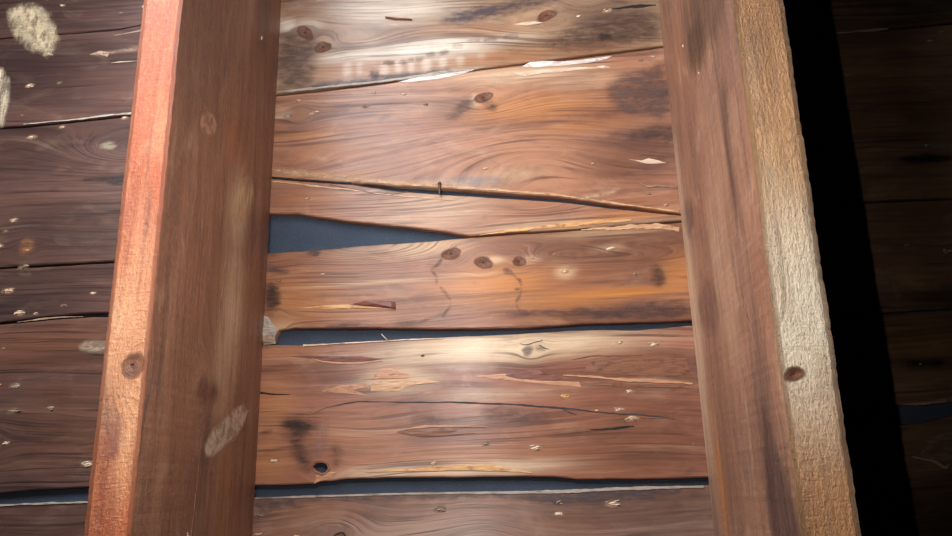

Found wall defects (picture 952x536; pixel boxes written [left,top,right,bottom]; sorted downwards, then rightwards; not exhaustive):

damp [0,70,8,124]
damp [611,68,669,114]
crack [272,169,679,213]
crack [260,392,673,430]